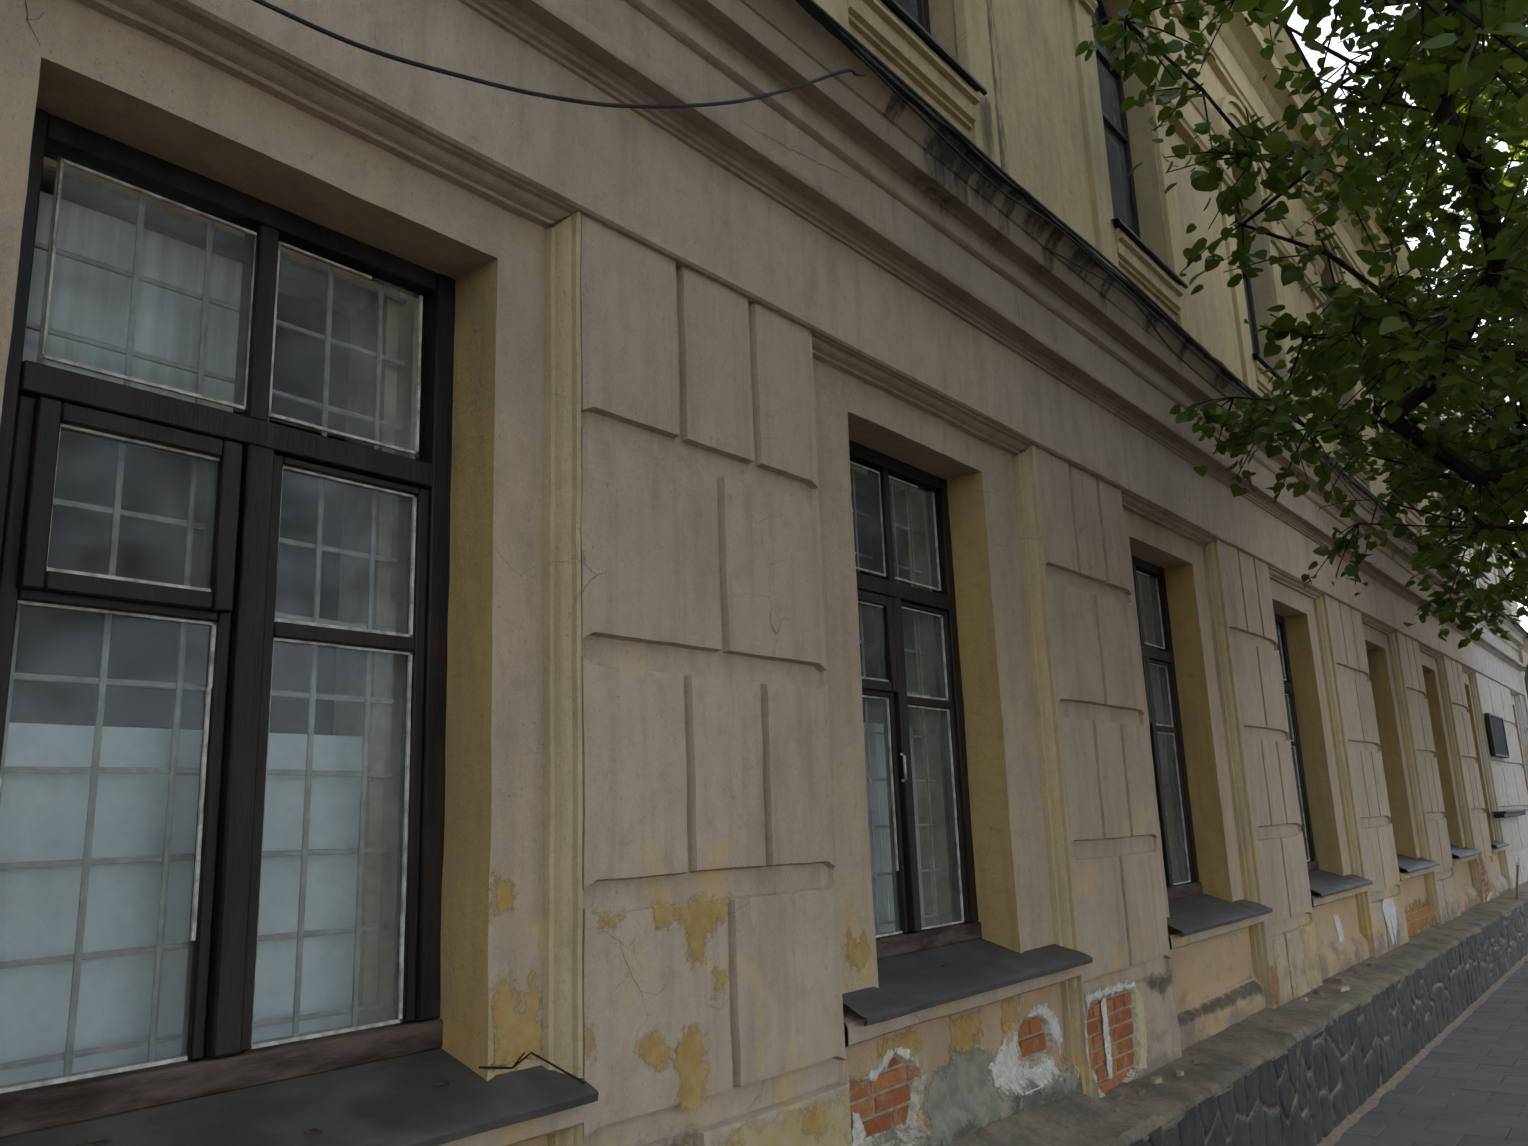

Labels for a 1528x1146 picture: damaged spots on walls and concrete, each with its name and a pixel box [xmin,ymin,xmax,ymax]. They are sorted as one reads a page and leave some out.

peeling [654,894,729,999]
peeling [491,971,543,1070]
peeling [638,1024,711,1112]
flaking render [849,1029,927,1146]
leakage [871,1048,1083,1146]
flaking render [948,980,1148,1098]